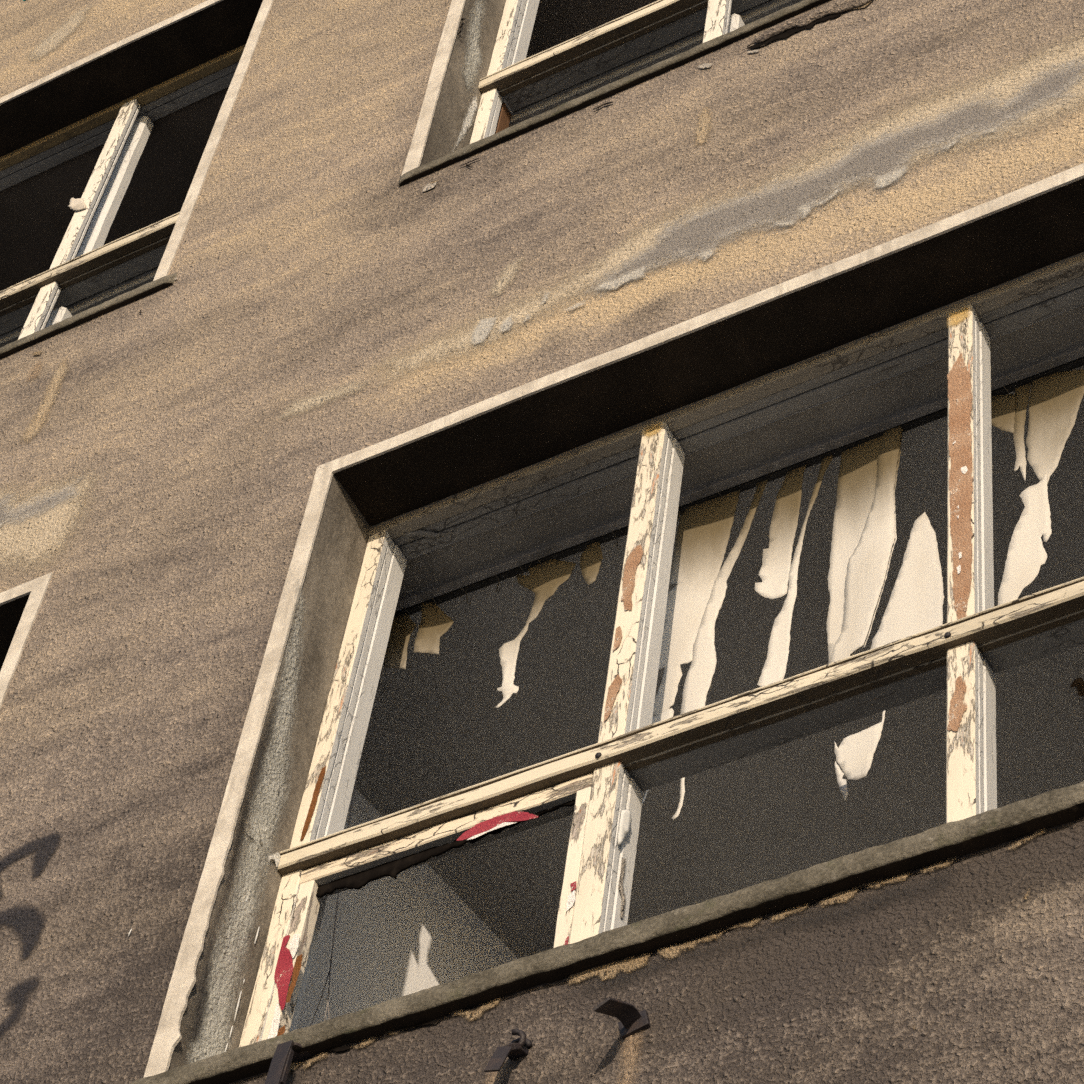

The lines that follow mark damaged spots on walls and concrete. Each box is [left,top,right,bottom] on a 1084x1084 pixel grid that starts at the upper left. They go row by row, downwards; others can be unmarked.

peeling [383,35,1084,383]
peeling [947,352,974,619]
peeling [621,544,643,610]
peeling [947,676,967,731]
peeling [300,766,326,840]
peeling [618,810,632,845]
peeling [618,858,626,919]
spalling [821,874,908,905]
spalling [568,904,808,984]
peeling [267,934,303,1039]
spalling [452,998,501,1020]
spalling [303,1053,326,1069]